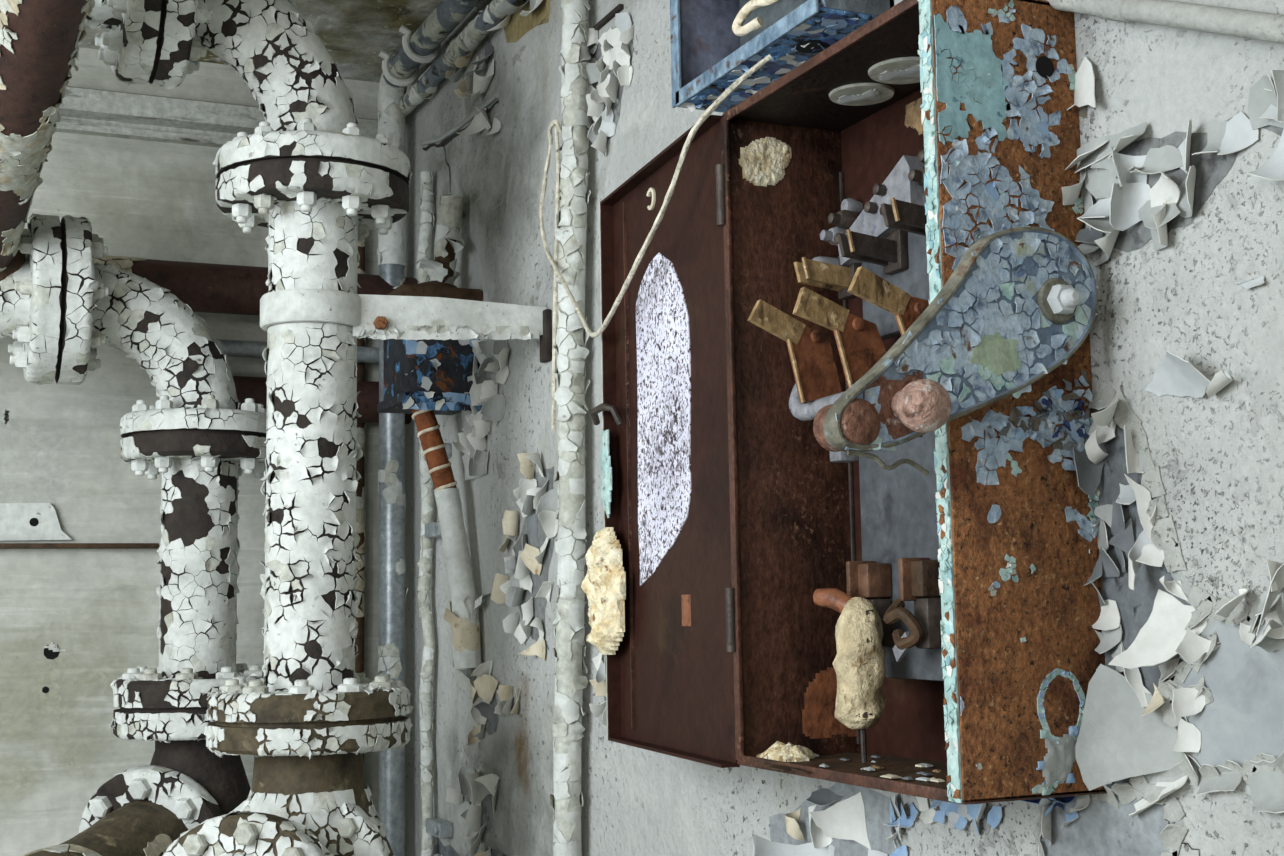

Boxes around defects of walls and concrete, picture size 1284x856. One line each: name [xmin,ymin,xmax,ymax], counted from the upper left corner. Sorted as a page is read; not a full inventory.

peeling [1067,56,1096,118]
peeling [1061,70,1284,266]
peeling [355,0,634,856]
peeling [1144,351,1233,398]
peeling [1018,389,1284,856]
peeling [751,783,1003,856]